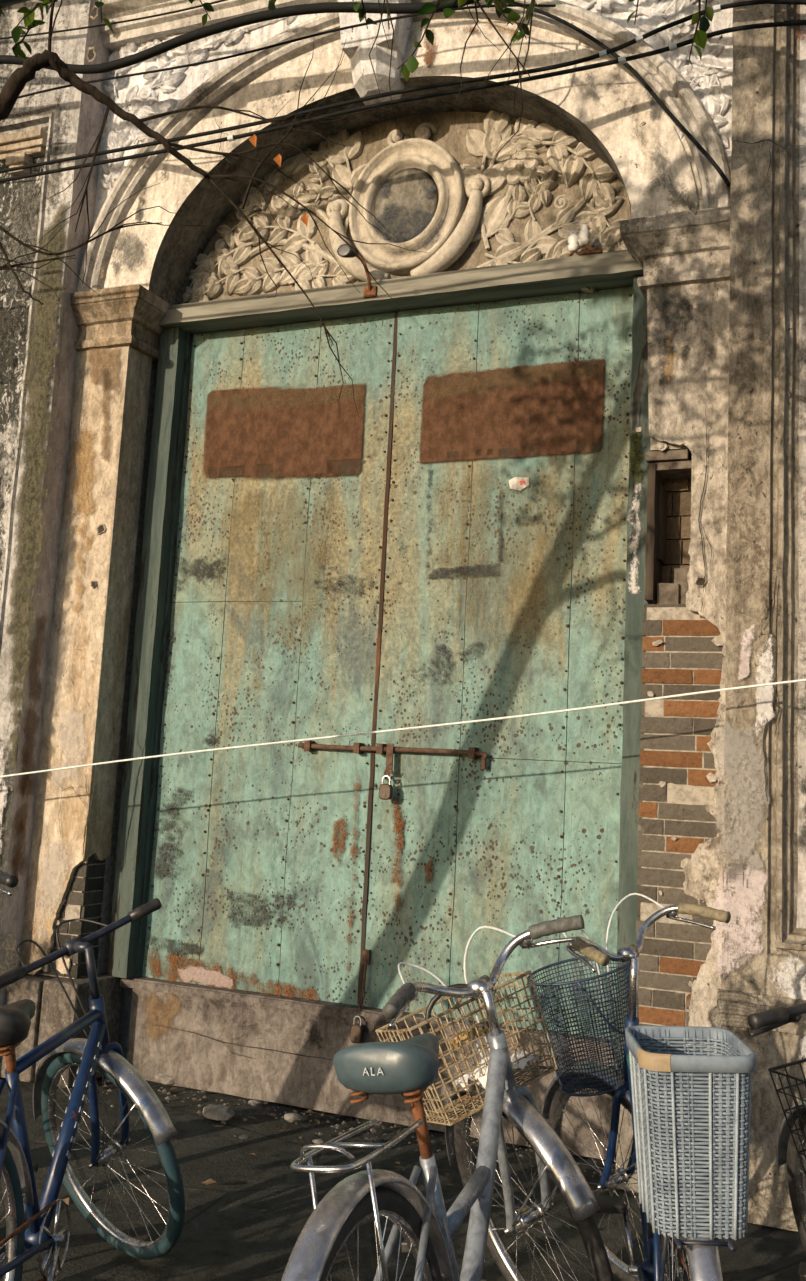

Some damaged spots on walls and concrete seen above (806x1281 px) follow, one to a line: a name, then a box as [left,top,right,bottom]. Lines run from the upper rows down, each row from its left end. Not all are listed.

water stain [0,184,41,386]
water stain [73,347,119,612]
rust [203,384,365,479]
rust [419,359,605,463]
water stain [13,619,45,888]
flaking render [627,427,767,1026]
flaking render [738,625,774,732]
flaking render [31,854,105,979]
rust [332,779,360,970]
rust [391,797,404,921]
rust [424,858,433,883]